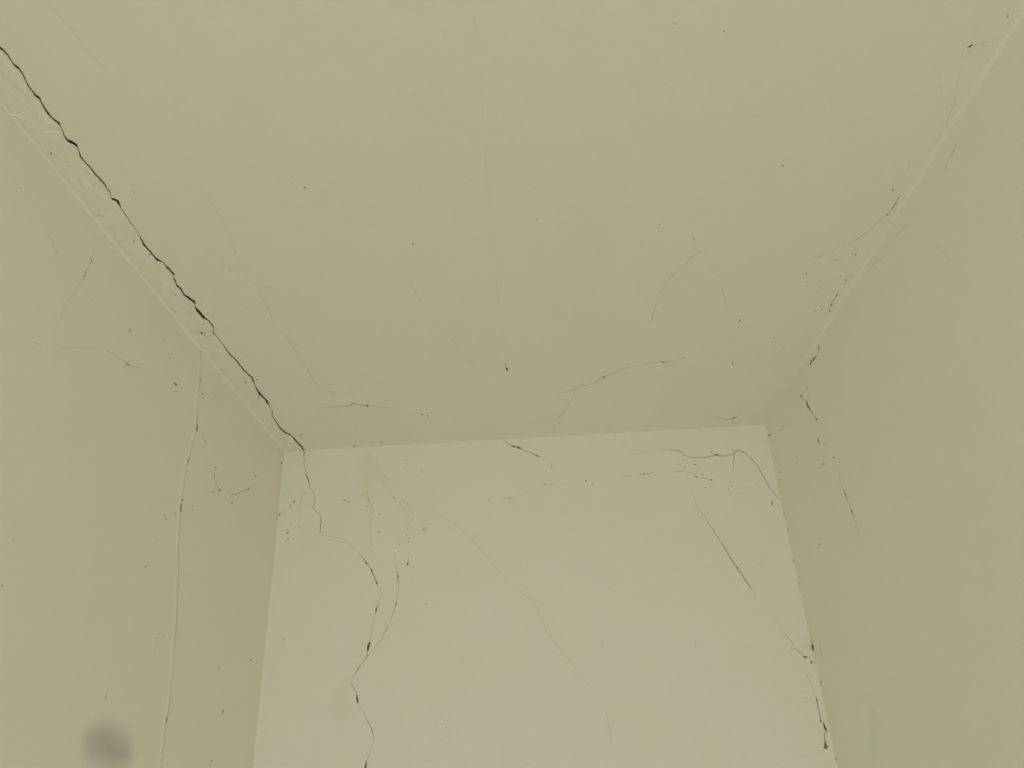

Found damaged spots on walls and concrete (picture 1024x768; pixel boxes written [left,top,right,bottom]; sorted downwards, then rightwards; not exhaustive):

crack [0,47,424,768]
crack [615,438,780,593]
crack [776,620,828,749]